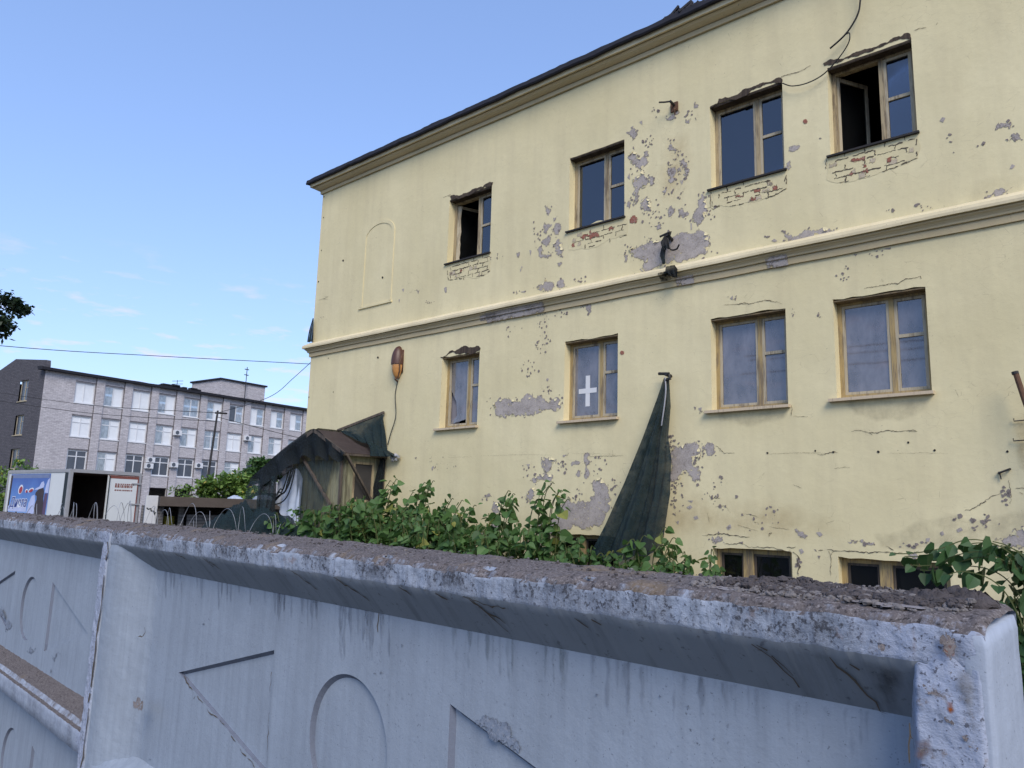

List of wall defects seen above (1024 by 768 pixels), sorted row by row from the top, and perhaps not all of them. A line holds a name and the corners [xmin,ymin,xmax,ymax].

peeling [652,102,699,123]
spalling [825,135,920,183]
spalling [444,253,503,293]
peeling [480,121,800,418]
peeling [481,493,500,535]
peeling [521,452,621,537]
peeling [668,435,738,524]
spalling [476,715,521,753]